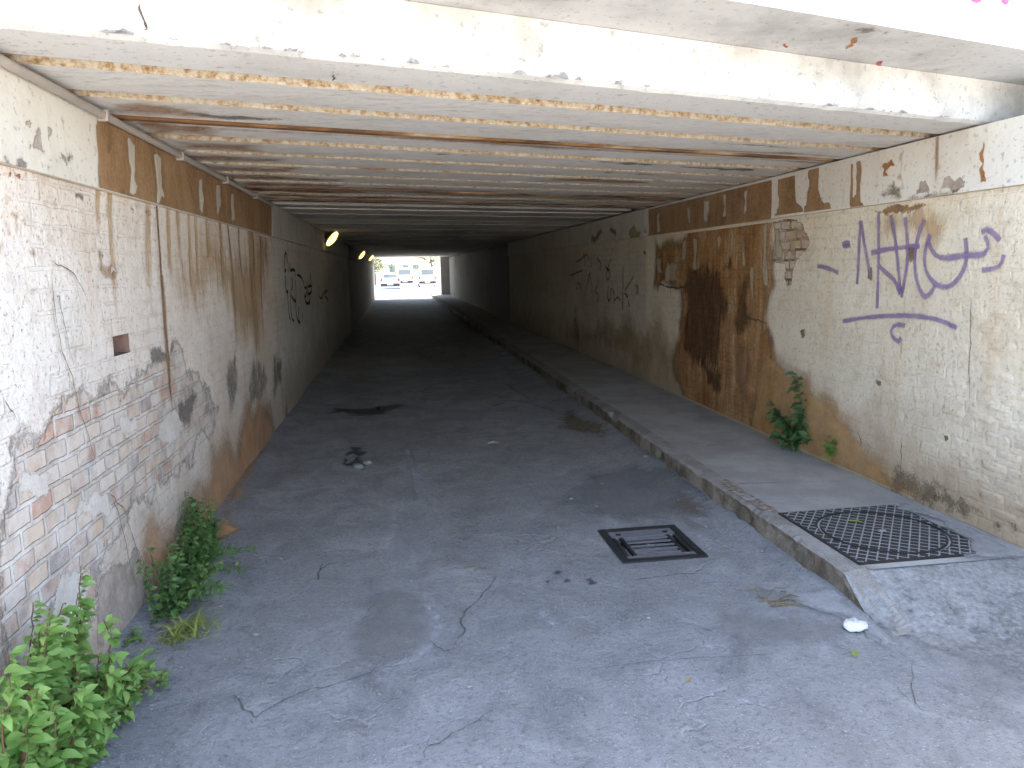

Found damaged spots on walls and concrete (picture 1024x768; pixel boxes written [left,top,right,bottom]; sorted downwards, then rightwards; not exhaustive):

corrosion [850,161,863,207]
corrosion [877,160,940,242]
flaking render [912,176,965,199]
corrosion [96,105,535,401]
peeling [773,219,809,285]
hole [113,333,130,357]
damp [151,345,173,362]
damp [178,390,197,427]
mould [227,357,282,408]
peeling [0,341,219,674]
crack [430,578,495,652]
crack [233,668,375,722]